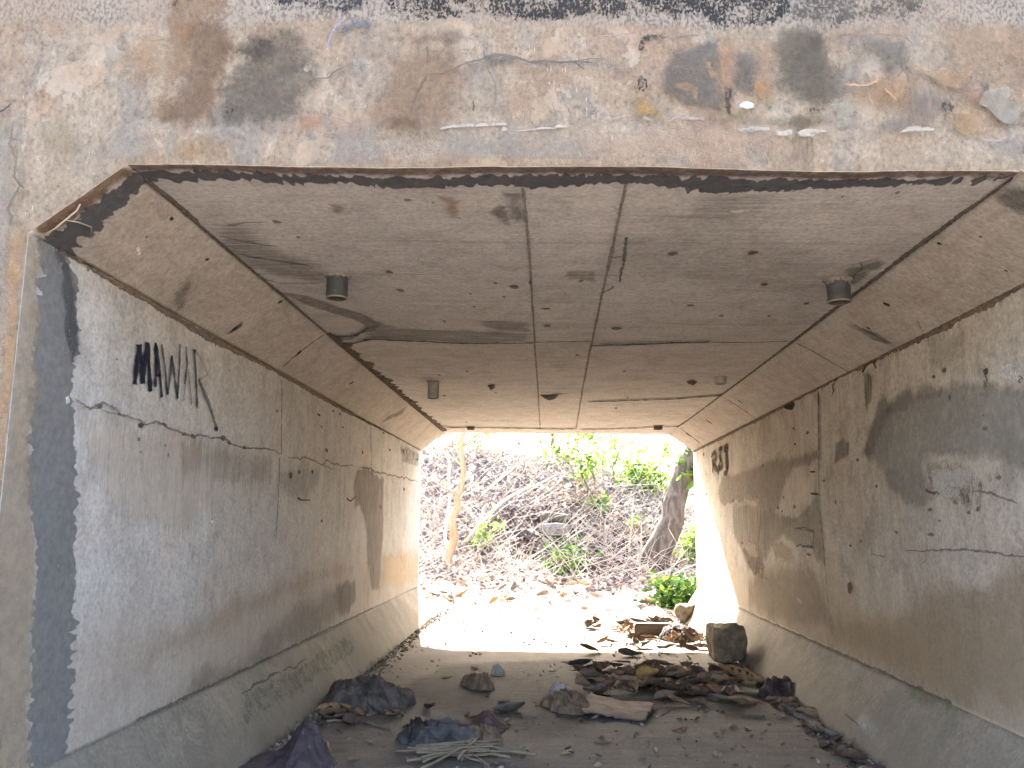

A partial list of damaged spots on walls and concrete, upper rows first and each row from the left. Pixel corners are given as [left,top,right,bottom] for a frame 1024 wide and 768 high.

leakage [224,34,312,121]
crack [411,43,636,124]
leakage [738,30,852,137]
crack [76,399,418,482]
leakage [0,164,1024,768]
crack [873,548,1024,563]